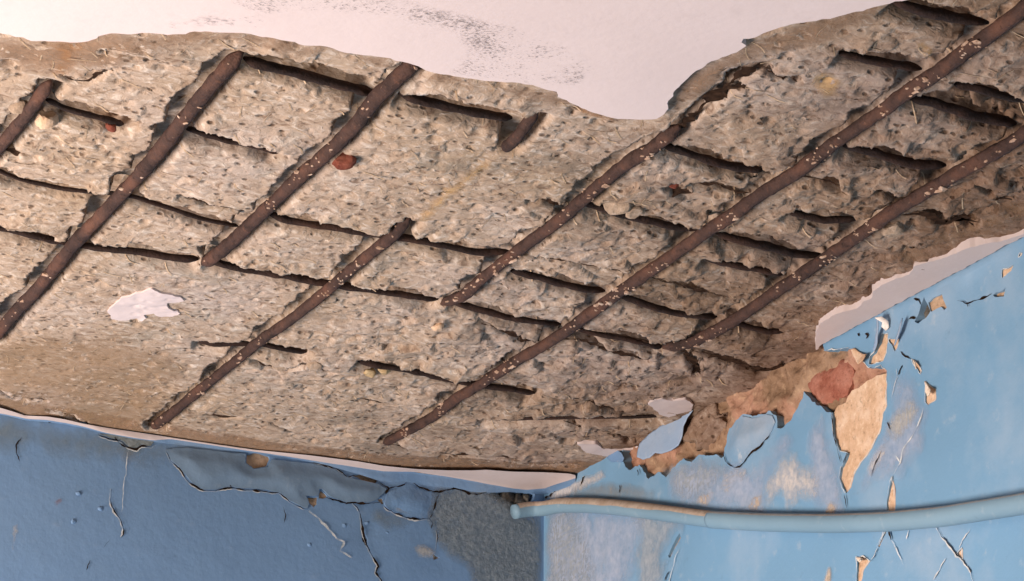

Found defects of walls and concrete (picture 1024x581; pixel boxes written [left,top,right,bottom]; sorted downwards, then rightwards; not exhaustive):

spalling [924,295,947,318]
peeling [869,316,903,365]
peeling [911,359,936,405]
flaking render [629,348,887,492]
crack [871,351,923,477]
spalling [246,446,269,468]
crack [86,435,485,581]
crack [934,528,973,581]